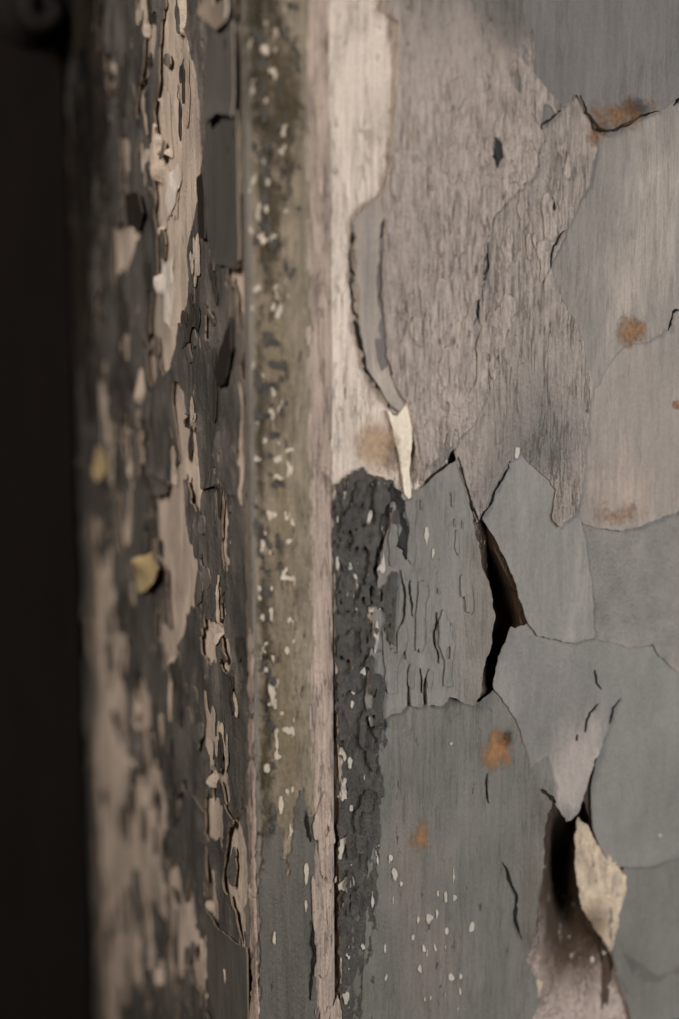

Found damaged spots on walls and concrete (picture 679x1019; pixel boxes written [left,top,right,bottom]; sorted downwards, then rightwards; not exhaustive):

crack [535,95,679,132]
crack [348,224,395,416]
crack [475,243,489,321]
crack [550,230,565,268]
corrosion [620,320,644,345]
peeling [66,0,335,1019]
crack [458,457,510,523]
peeling [320,0,679,1019]
crack [386,483,439,694]
crack [576,670,621,741]
crack [541,789,556,803]
crack [502,862,521,938]